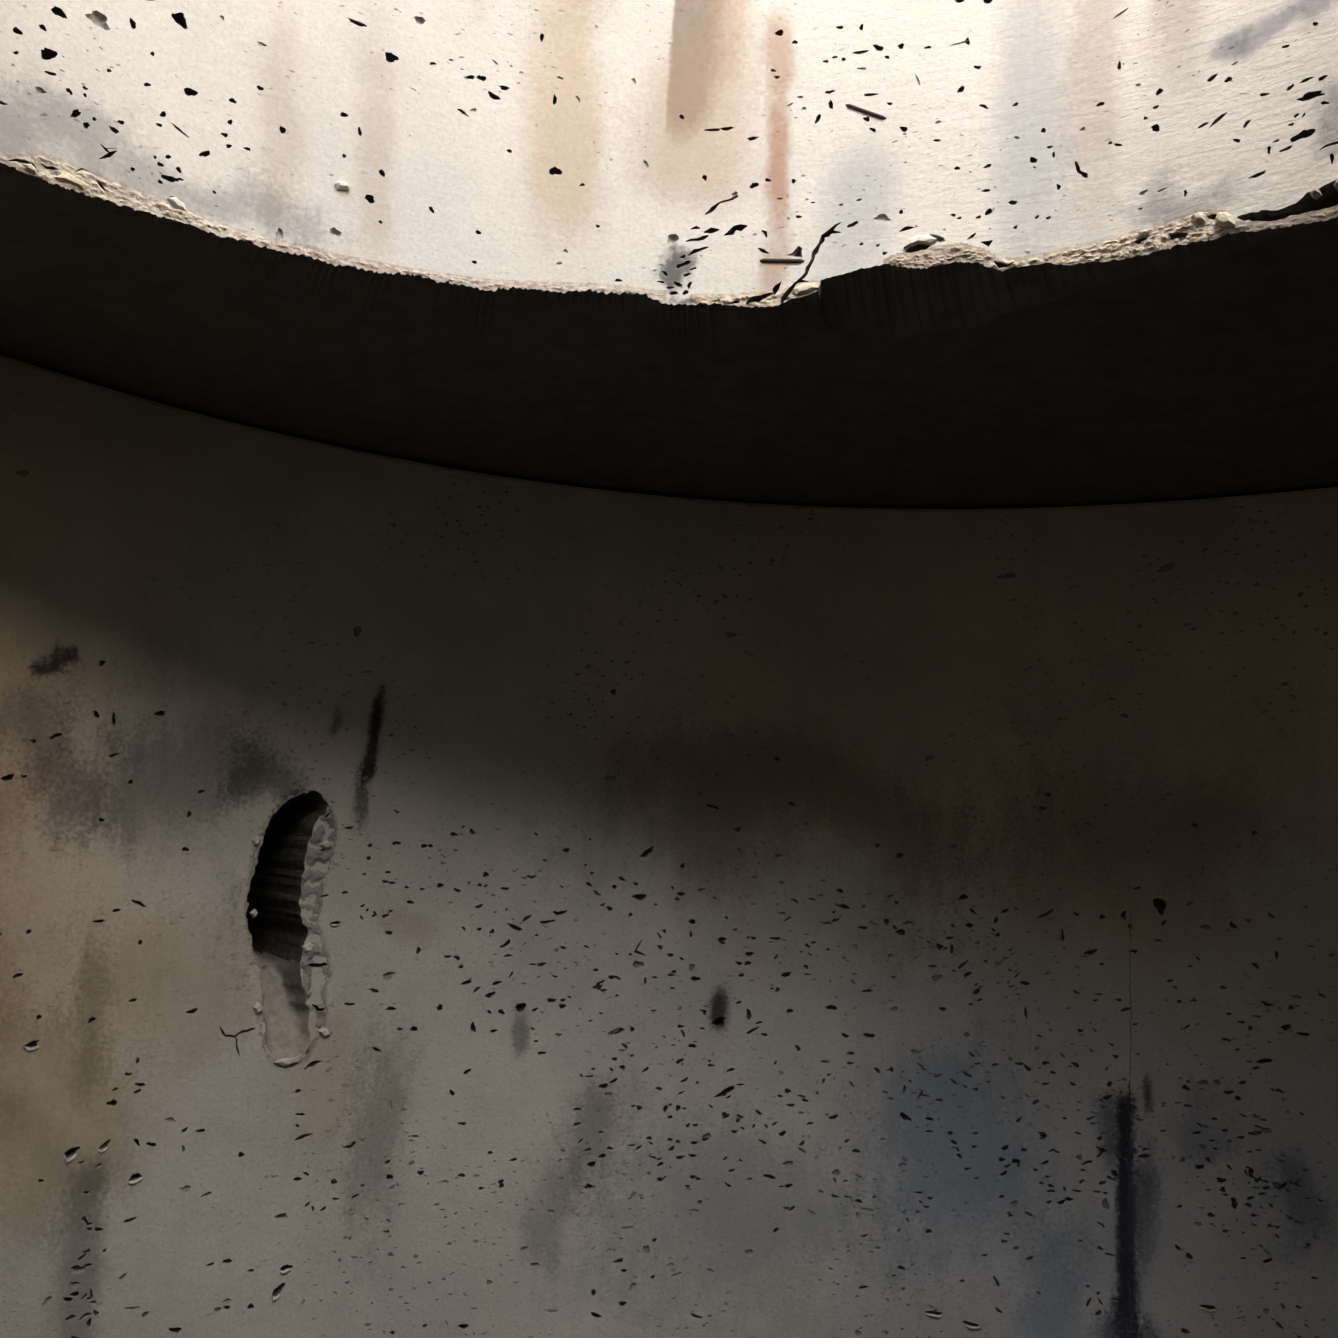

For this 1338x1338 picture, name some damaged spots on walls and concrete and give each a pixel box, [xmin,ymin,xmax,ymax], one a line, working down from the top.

hole [466,75,509,100]
spalling [0,152,821,307]
crack [681,195,841,305]
spalling [847,153,1338,271]
leakage [360,686,384,783]
spalling [246,789,310,961]
spalling [253,806,340,1066]
leakage [1112,1079,1151,1338]